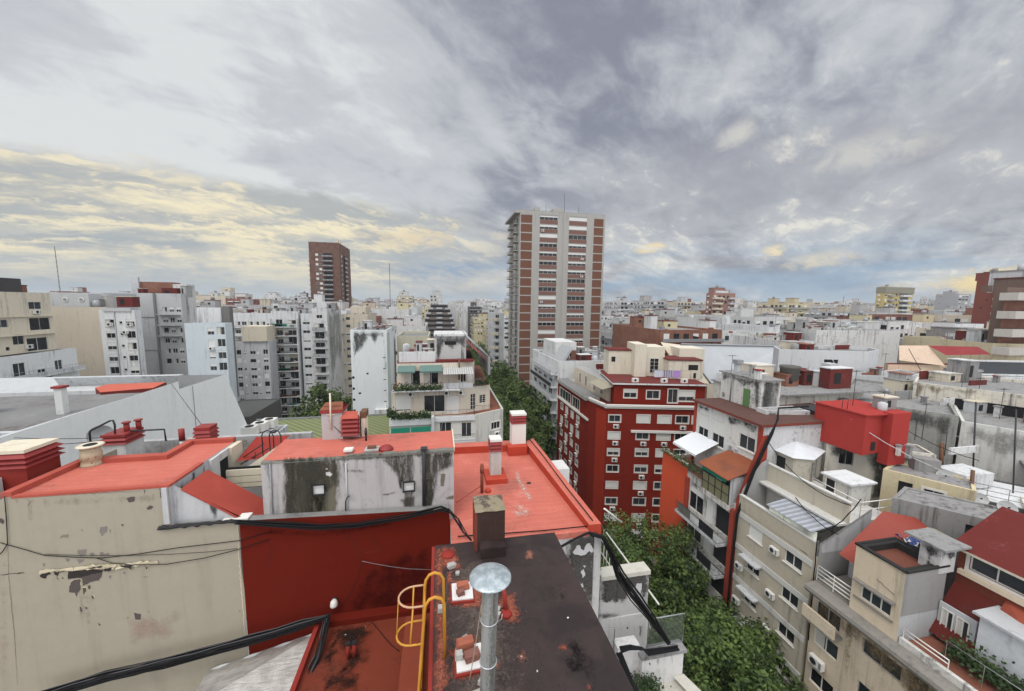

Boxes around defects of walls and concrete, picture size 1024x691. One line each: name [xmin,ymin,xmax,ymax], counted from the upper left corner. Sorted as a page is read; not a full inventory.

leakage [354,332,377,352]
leakage [284,453,454,513]
flaking render [39,549,158,612]
rust [434,547,482,691]
rust [500,595,519,622]
flaking render [573,543,594,588]
leakage [325,625,369,689]